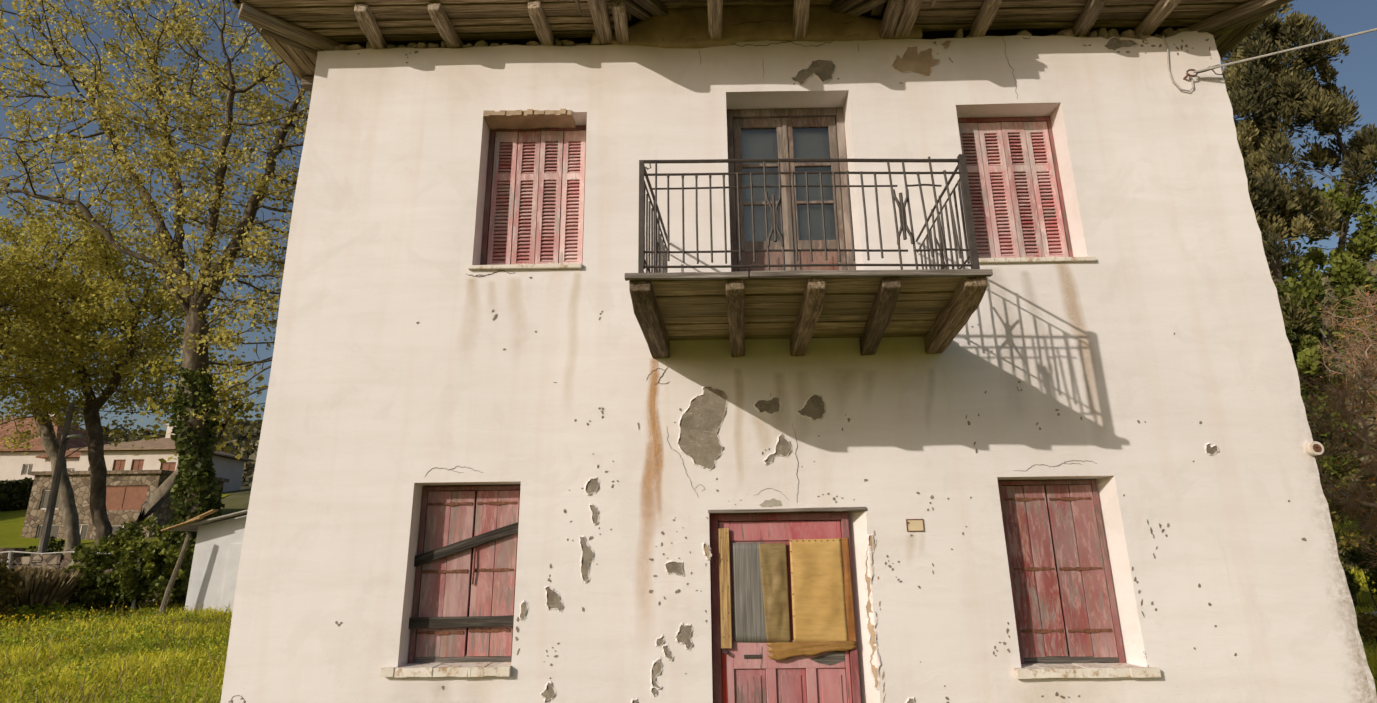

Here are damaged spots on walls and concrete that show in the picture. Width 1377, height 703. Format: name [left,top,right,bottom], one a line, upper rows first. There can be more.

peeling [790,59,839,86]
spalling [891,39,953,84]
corrosion [646,360,661,492]
peeling [674,386,728,492]
peeling [762,434,815,467]
peeling [753,393,827,437]
peeling [564,453,619,584]
peeling [515,564,564,655]
spalling [863,530,921,703]